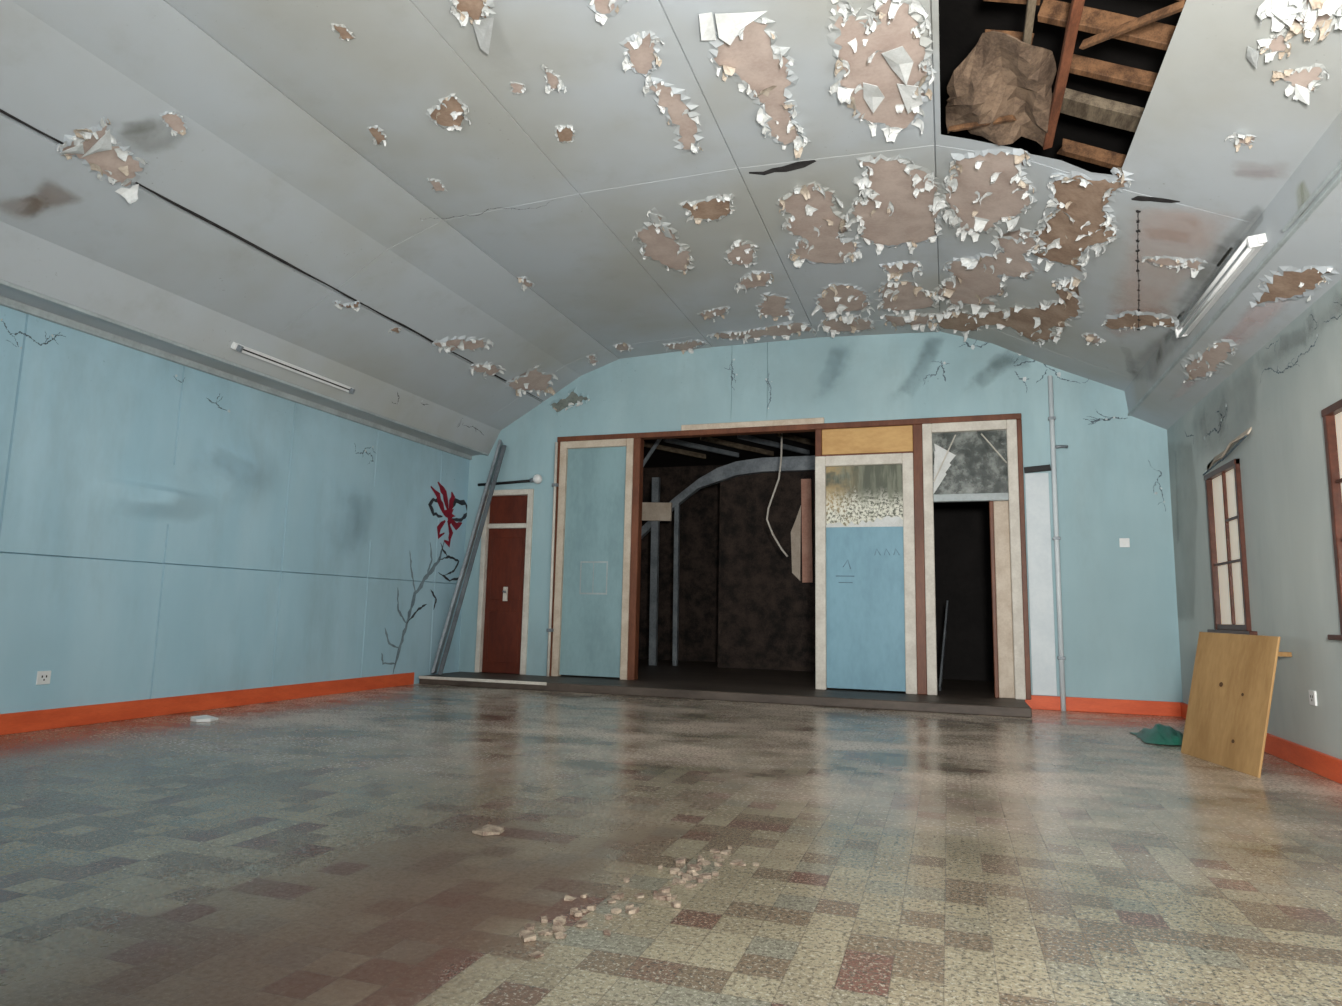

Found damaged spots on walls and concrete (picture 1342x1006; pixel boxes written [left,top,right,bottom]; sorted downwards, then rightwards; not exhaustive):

peeling [56,116,149,204]
peeling [159,111,188,136]
peeling [448,0,496,55]
peeling [554,124,576,144]
peeling [584,0,628,25]
peeling [619,30,704,153]
peeling [662,0,1180,359]
peeling [1246,0,1342,105]
peeling [632,193,735,275]
peeling [1249,265,1340,308]
crack [0,319,66,349]
peeling [432,335,590,417]